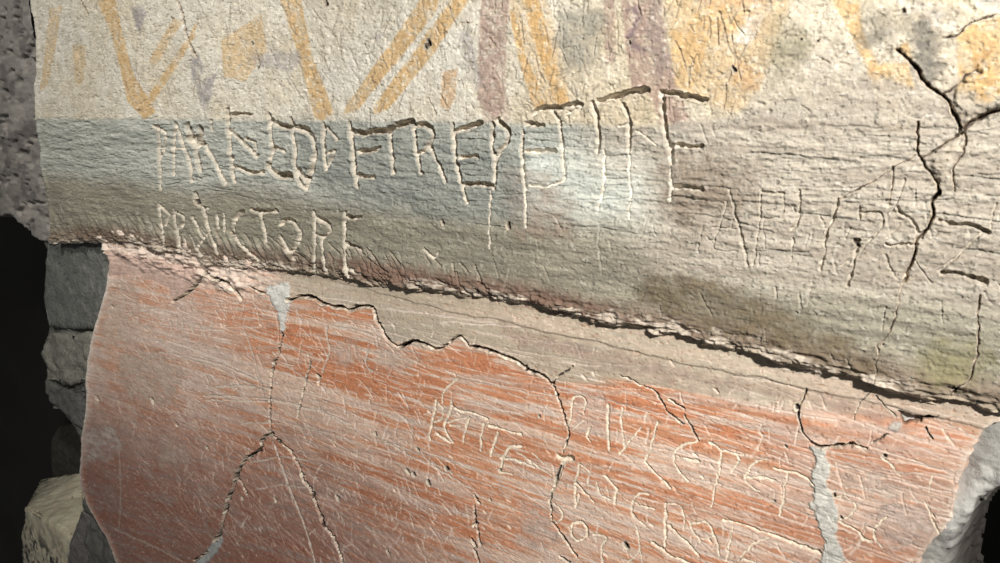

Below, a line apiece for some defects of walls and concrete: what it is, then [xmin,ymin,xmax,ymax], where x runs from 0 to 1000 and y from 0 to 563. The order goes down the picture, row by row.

crack [941,13,1000,39]
crack [796,48,1000,450]
flaking render [408,278,528,304]
flaking render [564,307,722,349]
flaking render [759,346,905,394]
crack [172,269,579,563]